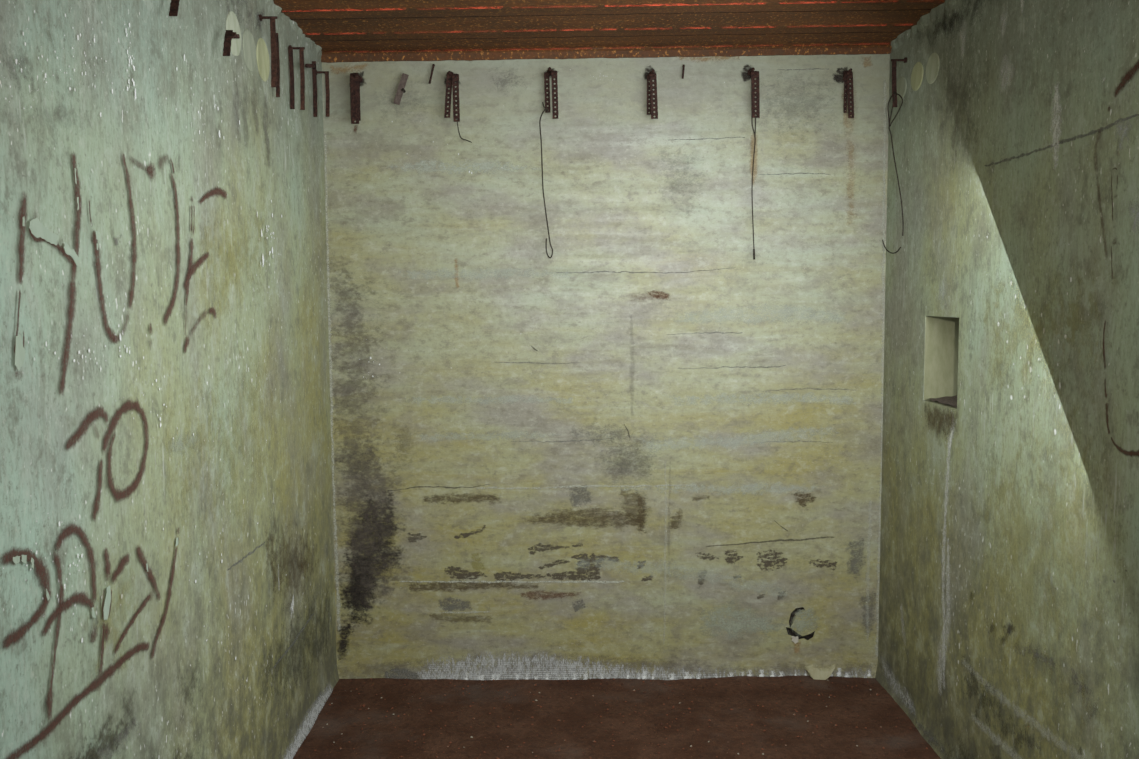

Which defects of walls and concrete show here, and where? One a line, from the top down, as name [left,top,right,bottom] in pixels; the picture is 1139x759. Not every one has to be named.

damp [424,494,497,503]
damp [531,487,644,531]
damp [793,492,816,507]
damp [338,492,401,656]
damp [410,582,585,612]